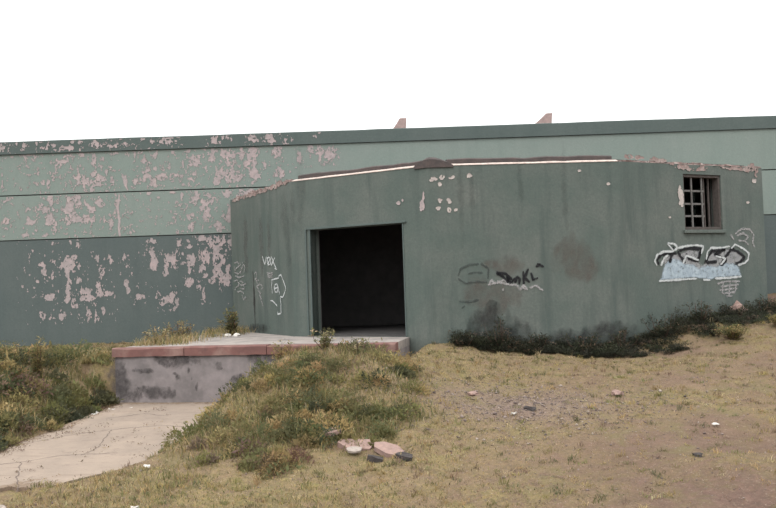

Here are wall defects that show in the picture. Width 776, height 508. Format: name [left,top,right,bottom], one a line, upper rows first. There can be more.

spalling [621,154,761,183]
peeling [0,132,341,324]
water stain [108,359,170,398]
water stain [155,356,189,377]